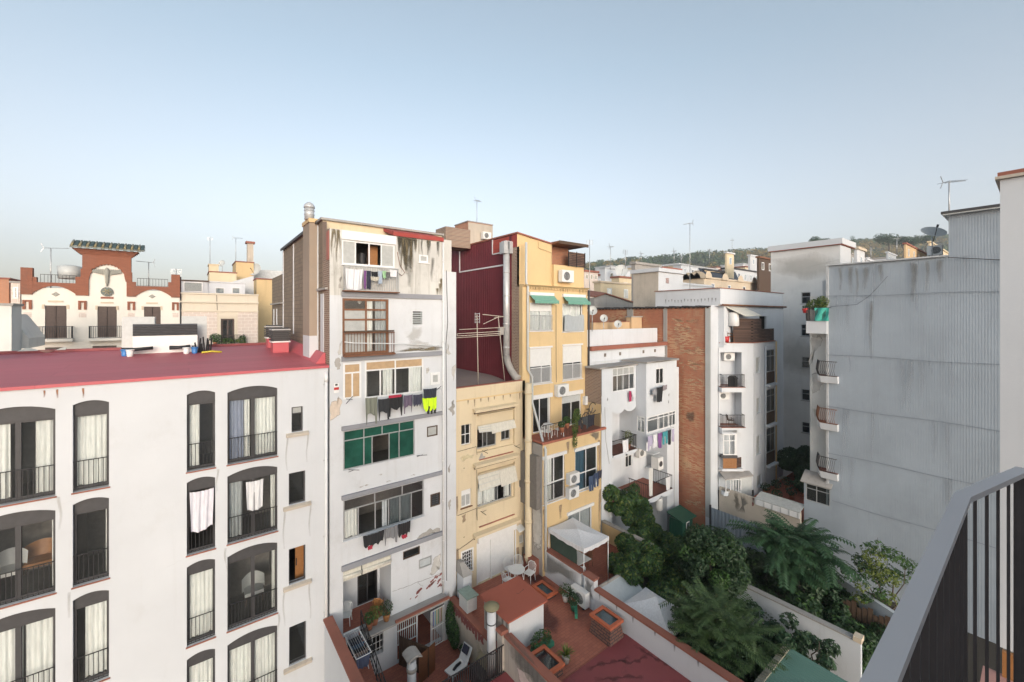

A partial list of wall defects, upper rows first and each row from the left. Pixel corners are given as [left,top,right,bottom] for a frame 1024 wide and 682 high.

leakage [398,237,429,260]